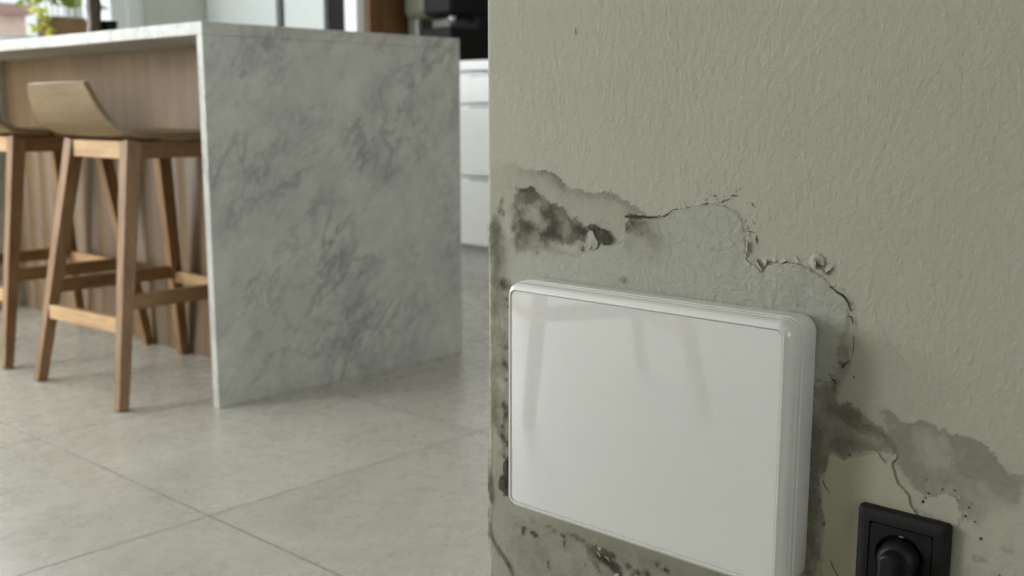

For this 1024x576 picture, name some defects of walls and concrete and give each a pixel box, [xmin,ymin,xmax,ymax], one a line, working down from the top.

water stain [489,186,586,313]
flaking render [497,204,848,388]
water stain [492,399,509,458]
water stain [488,464,513,576]
water stain [560,533,668,576]
water stain [806,388,1018,576]